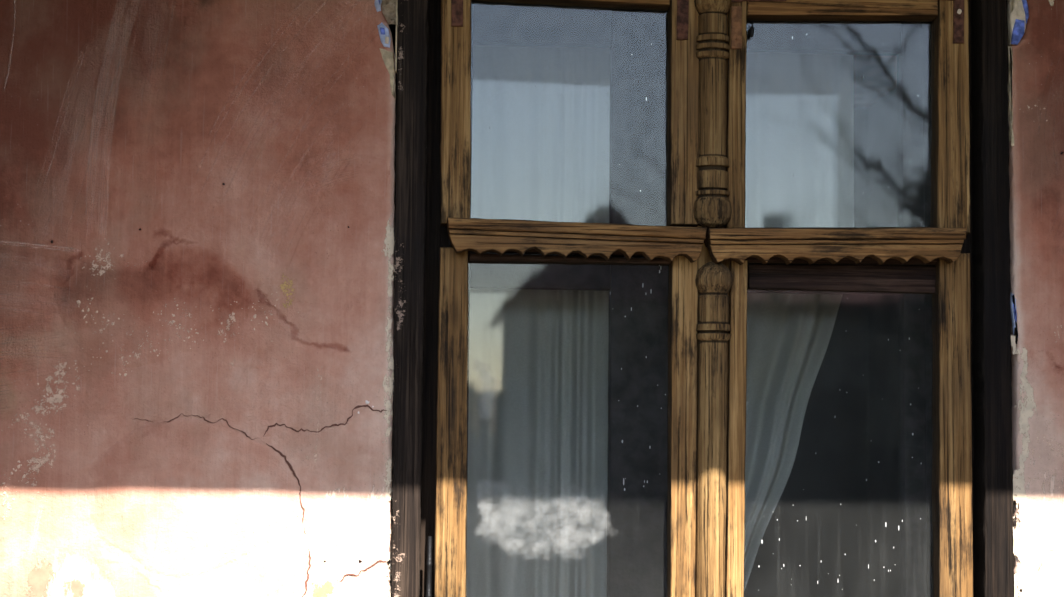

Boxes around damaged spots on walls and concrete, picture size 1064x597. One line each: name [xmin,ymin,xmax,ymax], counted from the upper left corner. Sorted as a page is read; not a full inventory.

spalling [375,0,395,98]
water stain [1,348,83,530]
peeling [41,547,117,597]
water stain [77,238,204,380]
crack [135,400,391,597]
peeling [272,530,391,597]
peeling [381,215,395,502]
peeling [1010,292,1037,597]